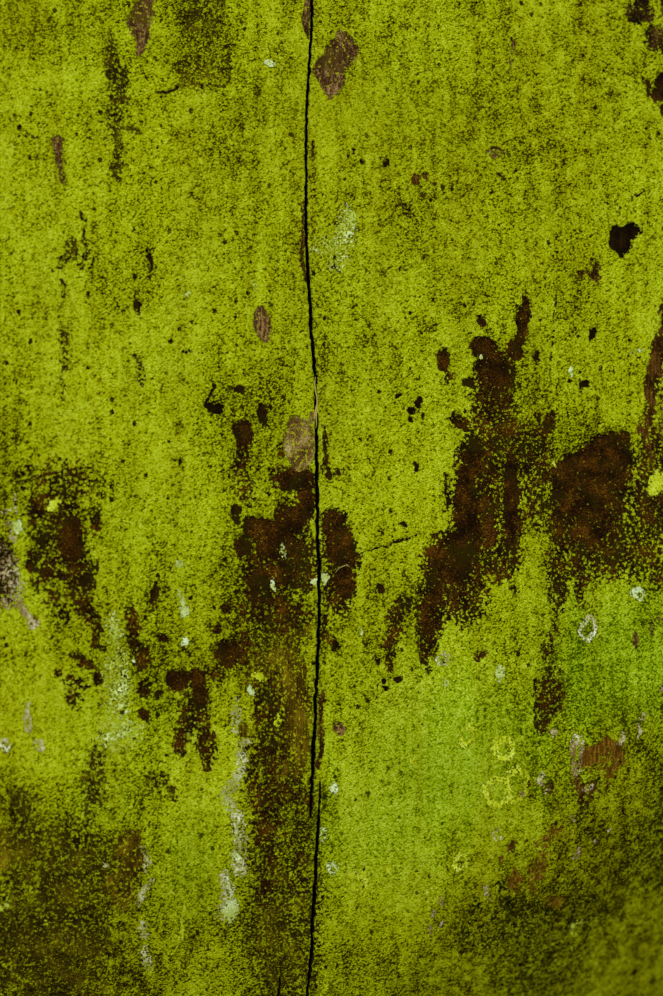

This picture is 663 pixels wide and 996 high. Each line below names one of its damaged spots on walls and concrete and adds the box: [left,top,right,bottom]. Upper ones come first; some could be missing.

peeling [312,29,359,100]
crack [304,0,322,996]
water stain [531,632,568,736]